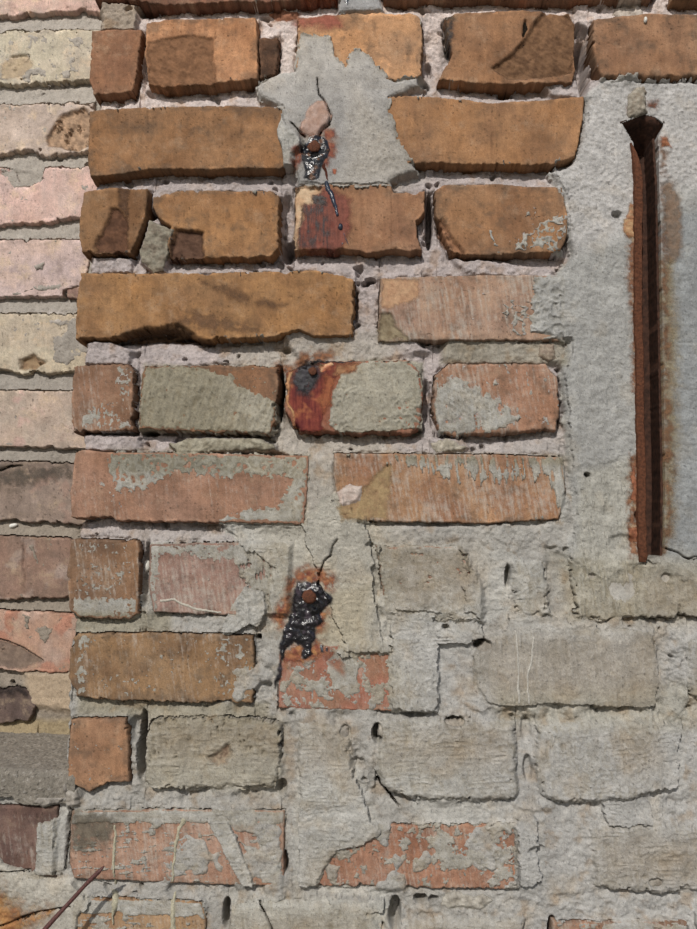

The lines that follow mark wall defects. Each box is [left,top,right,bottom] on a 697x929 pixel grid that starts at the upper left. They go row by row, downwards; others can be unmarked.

corrosion [299,0,349,28]
peeling [277,114,303,175]
corrosion [292,101,351,259]
corrosion [623,203,634,313]
corrosion [277,352,358,433]
spalling [338,465,391,520]
corrosion [627,455,638,555]
corrosion [272,568,343,688]
corrosion [0,894,51,929]